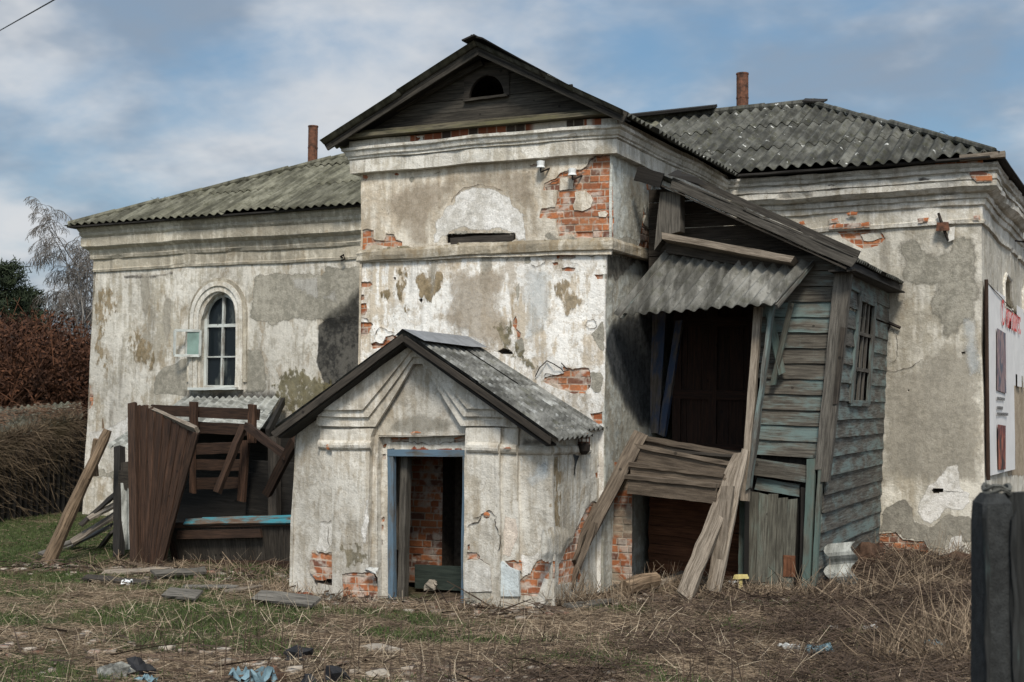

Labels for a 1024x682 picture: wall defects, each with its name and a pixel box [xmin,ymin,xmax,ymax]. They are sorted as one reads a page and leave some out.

spalling [540,155,614,238]
spalling [362,229,402,250]
spalling [829,211,885,249]
damp [380,257,506,342]
damp [95,289,117,370]
damp [128,332,155,370]
spalling [544,367,591,394]
peeling [1,563,289,586]
flaking render [310,501,596,626]
peeling [0,630,136,675]
peeling [145,642,303,682]
peeling [380,663,557,682]